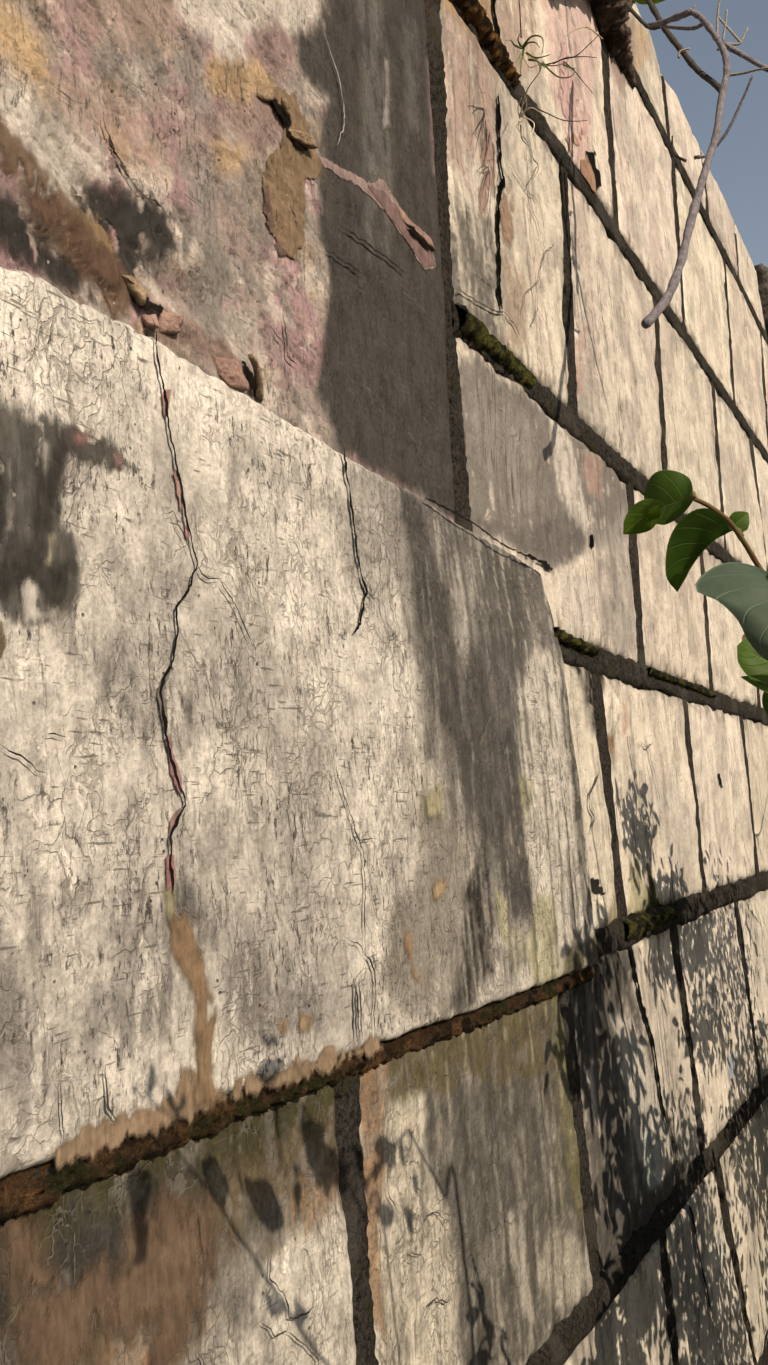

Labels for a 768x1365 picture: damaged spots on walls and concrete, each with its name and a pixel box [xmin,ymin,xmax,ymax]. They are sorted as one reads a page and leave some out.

leakage [0,192,93,300]
leakage [72,175,177,278]
peeling [256,81,436,270]
spalling [121,275,184,335]
spalling [212,354,264,402]
leakage [0,403,129,622]
crack [344,451,377,632]
crack [154,322,257,905]
crack [262,1255,319,1365]